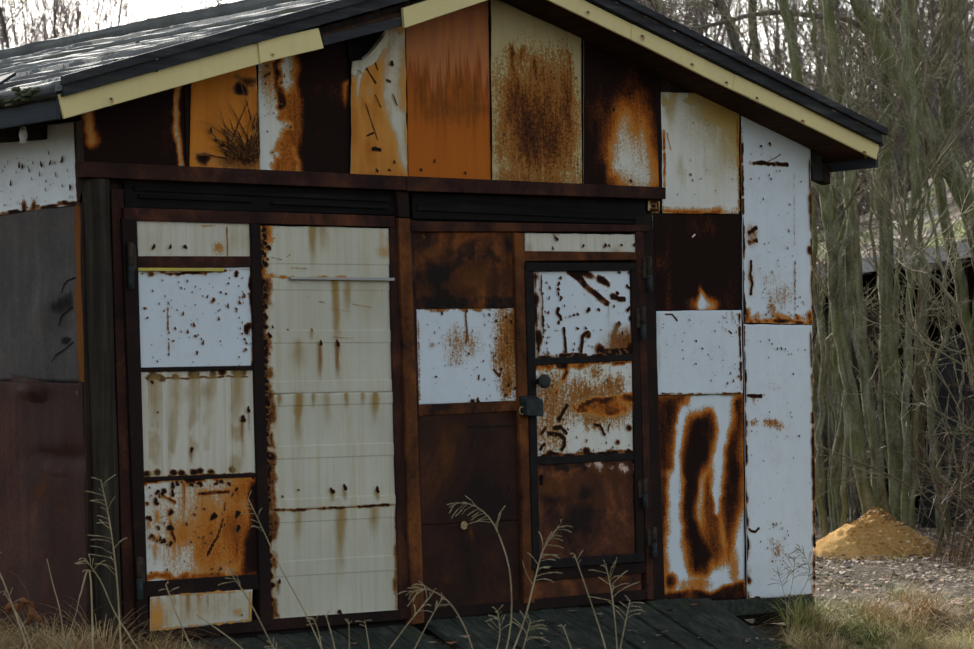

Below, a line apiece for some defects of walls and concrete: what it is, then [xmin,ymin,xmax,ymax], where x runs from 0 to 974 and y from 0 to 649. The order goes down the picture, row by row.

corrosion [260,40,350,174]
corrosion [491,34,671,187]
corrosion [145,271,250,384]
corrosion [260,226,397,619]
corrosion [416,297,517,401]
corrosion [534,272,634,457]
corrosion [650,119,816,599]
corrosion [144,466,258,581]
corrosion [150,589,252,631]